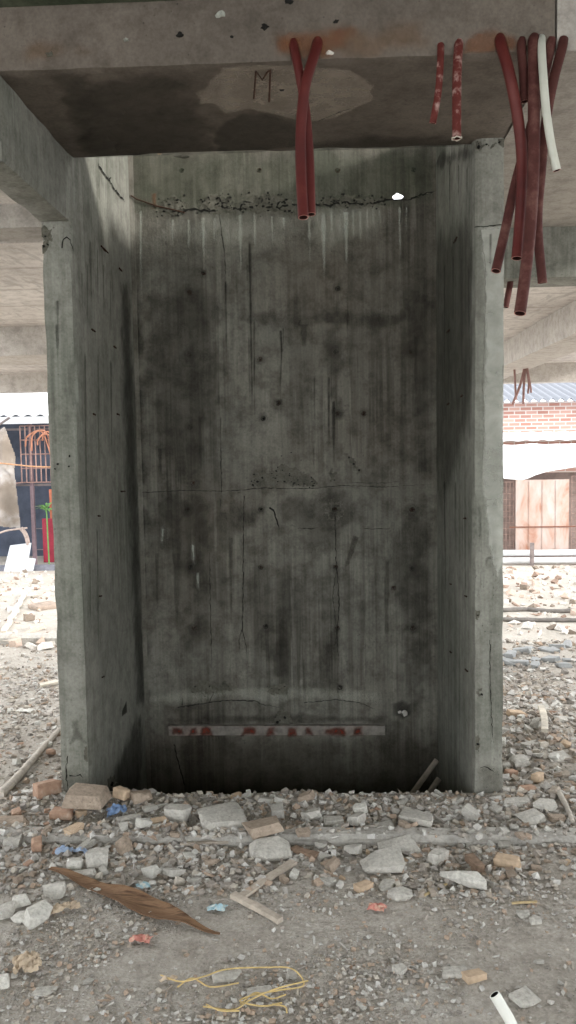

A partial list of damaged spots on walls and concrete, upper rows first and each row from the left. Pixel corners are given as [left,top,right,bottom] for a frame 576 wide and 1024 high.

crack [178,687,274,708]